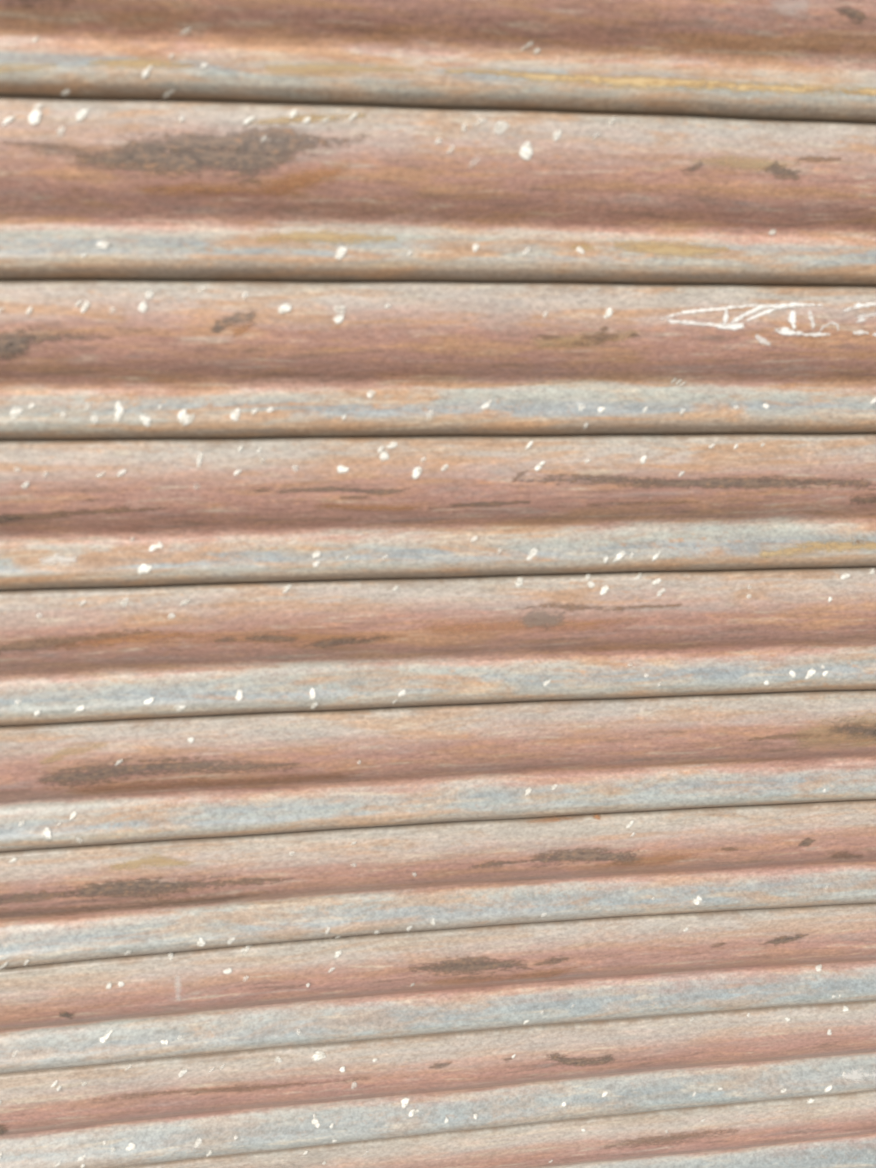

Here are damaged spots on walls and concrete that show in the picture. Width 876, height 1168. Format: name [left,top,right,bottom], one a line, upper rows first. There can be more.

corrosion [75,114,368,196]
corrosion [0,327,107,360]
corrosion [749,721,876,741]
corrosion [39,756,330,792]
corrosion [472,847,643,868]
corrosion [0,854,289,904]
corrosion [410,955,569,976]